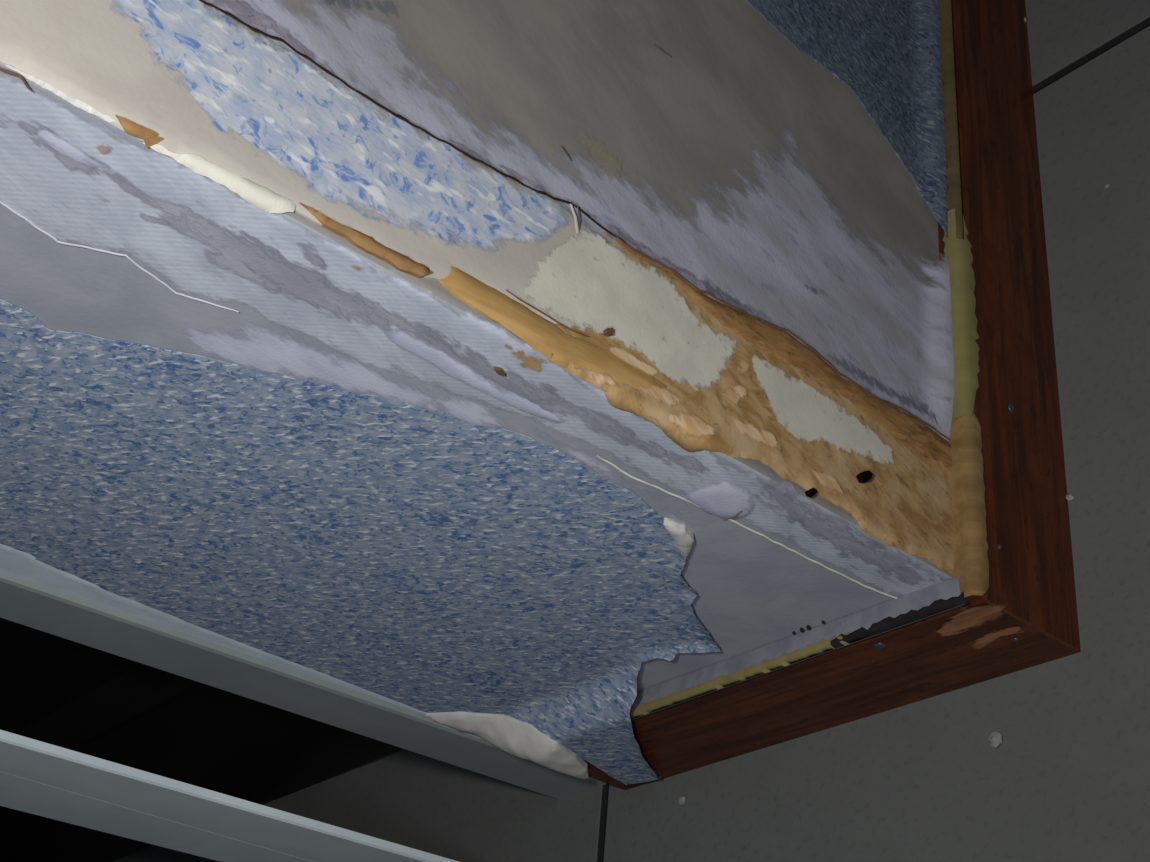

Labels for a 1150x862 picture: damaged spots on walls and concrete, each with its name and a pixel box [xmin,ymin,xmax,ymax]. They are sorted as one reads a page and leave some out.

water stain [18,122,707,472]
crack [199,0,626,243]
flaking render [0,64,989,598]
water stain [831,358,937,423]
water stain [938,0,980,420]
peeling [0,544,427,715]
water stain [755,470,933,584]